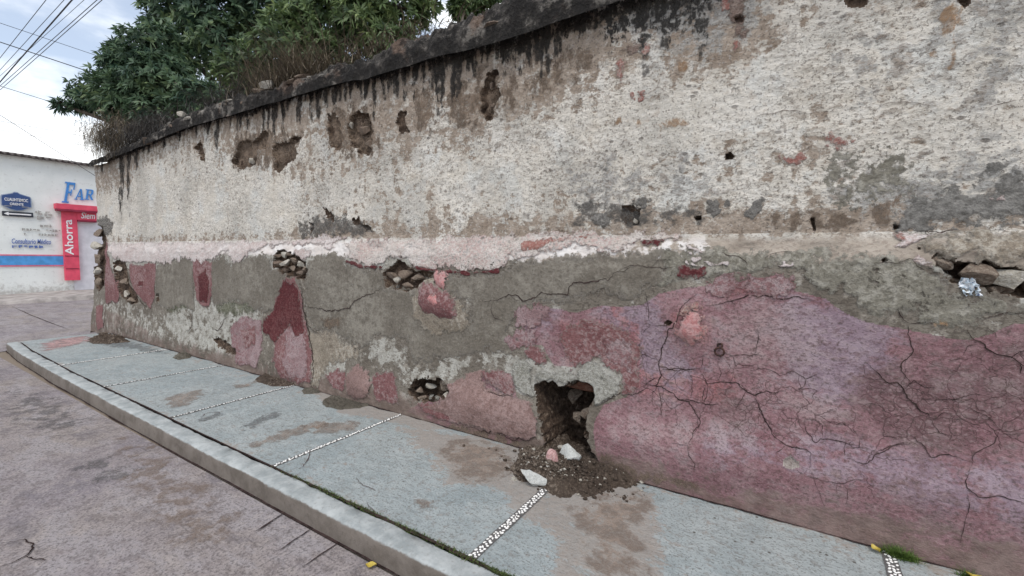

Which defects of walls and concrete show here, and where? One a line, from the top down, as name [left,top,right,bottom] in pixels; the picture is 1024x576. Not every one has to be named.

spalling [327,110,374,156]
leakage [96,0,722,239]
spalling [479,69,501,121]
flaking render [90,131,1024,448]
crack [483,258,671,320]
crack [605,295,1024,538]